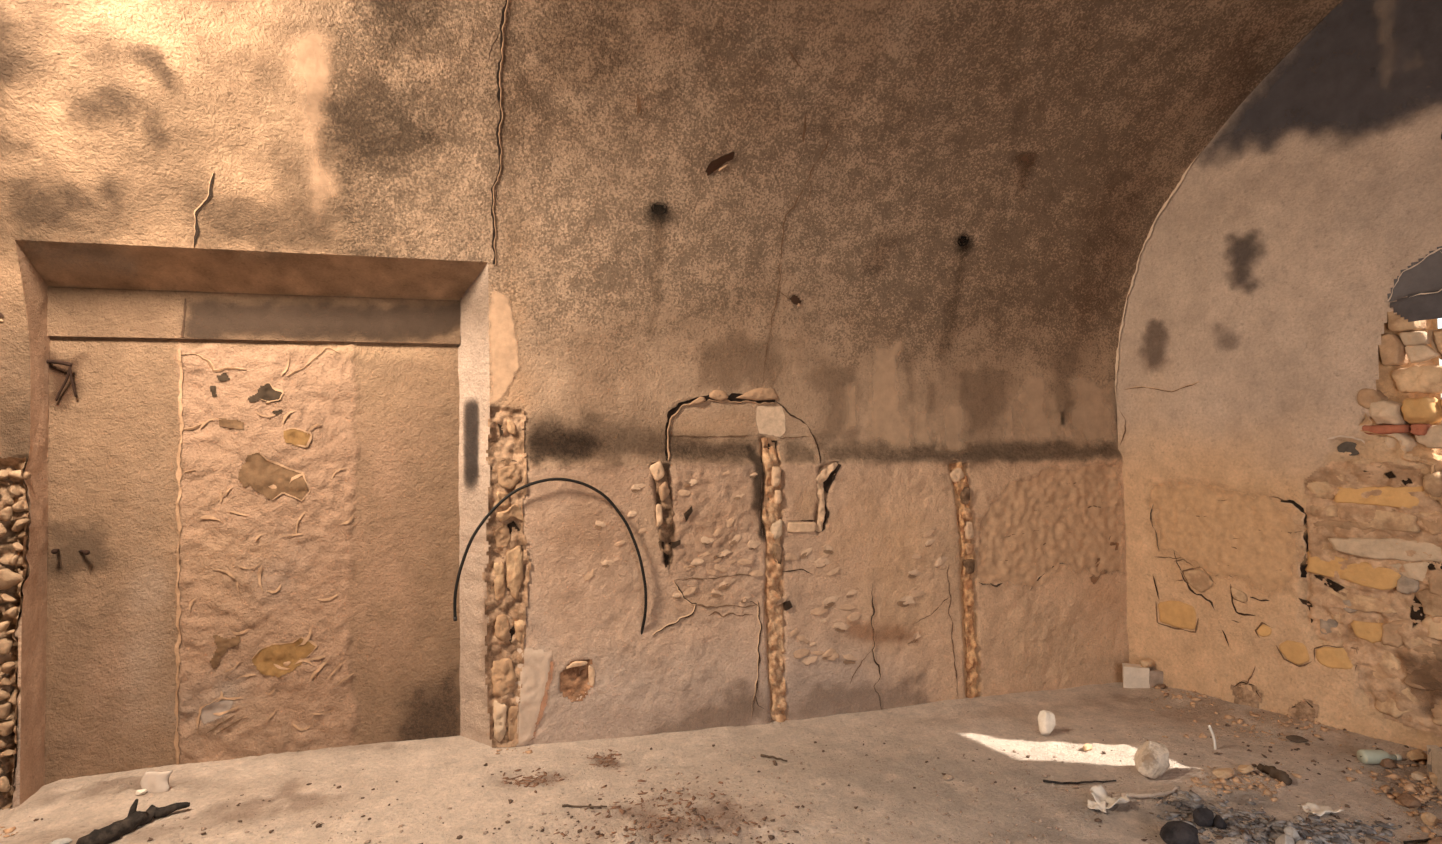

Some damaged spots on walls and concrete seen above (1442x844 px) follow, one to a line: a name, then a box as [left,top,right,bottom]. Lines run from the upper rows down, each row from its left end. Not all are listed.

crack [487,0,509,264]
crack [193,172,214,247]
flaking render [1387,246,1442,302]
peeling [238,453,310,501]
peeling [248,383,312,448]
spalling [1328,435,1365,456]
spalling [482,405,595,748]
peeling [210,635,240,669]
peeling [251,637,318,678]
crack [652,574,764,717]
crack [850,585,883,710]
flaking render [1255,622,1358,669]